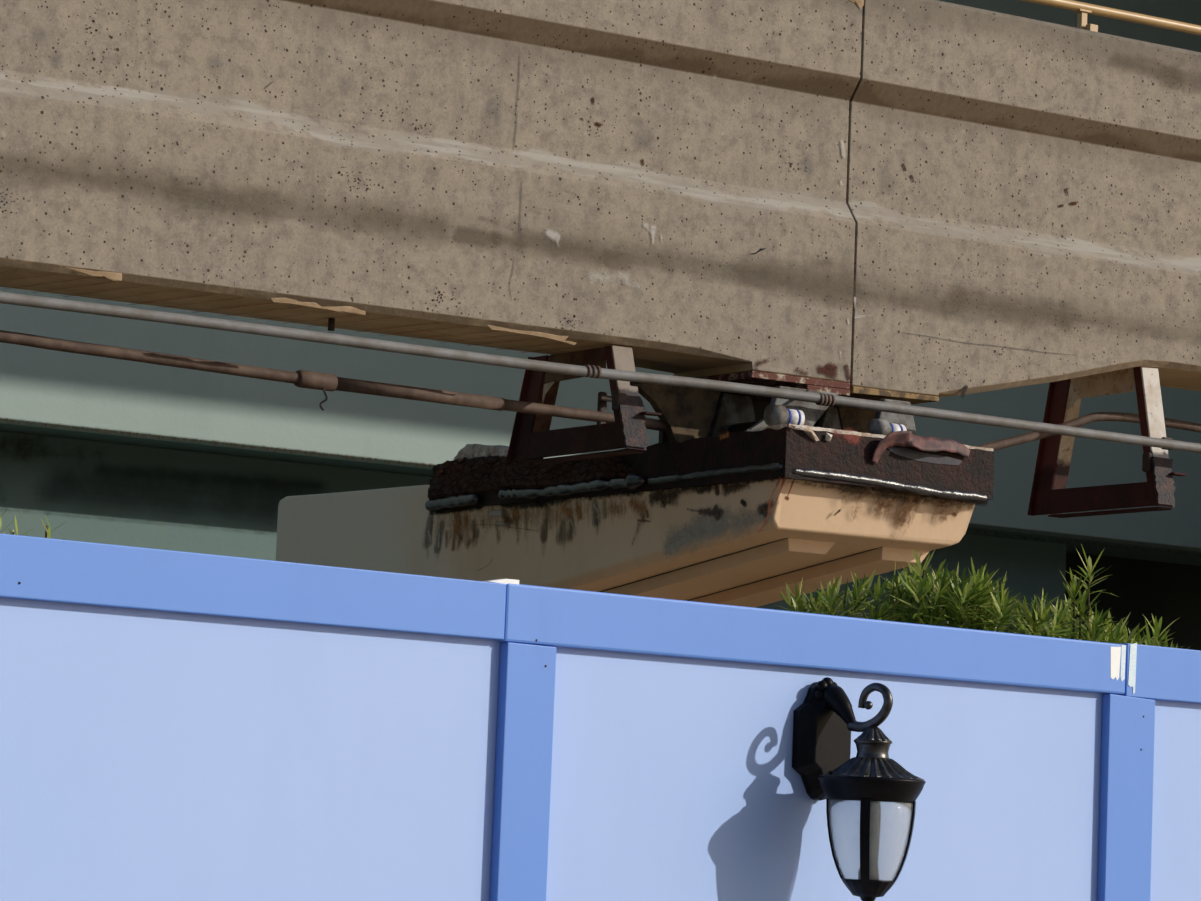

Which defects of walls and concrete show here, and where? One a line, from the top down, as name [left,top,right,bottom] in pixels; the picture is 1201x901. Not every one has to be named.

rust [424,455,650,553]
damp [502,479,774,520]
rust [759,476,795,532]
damp [791,482,972,509]
rust [878,493,919,527]